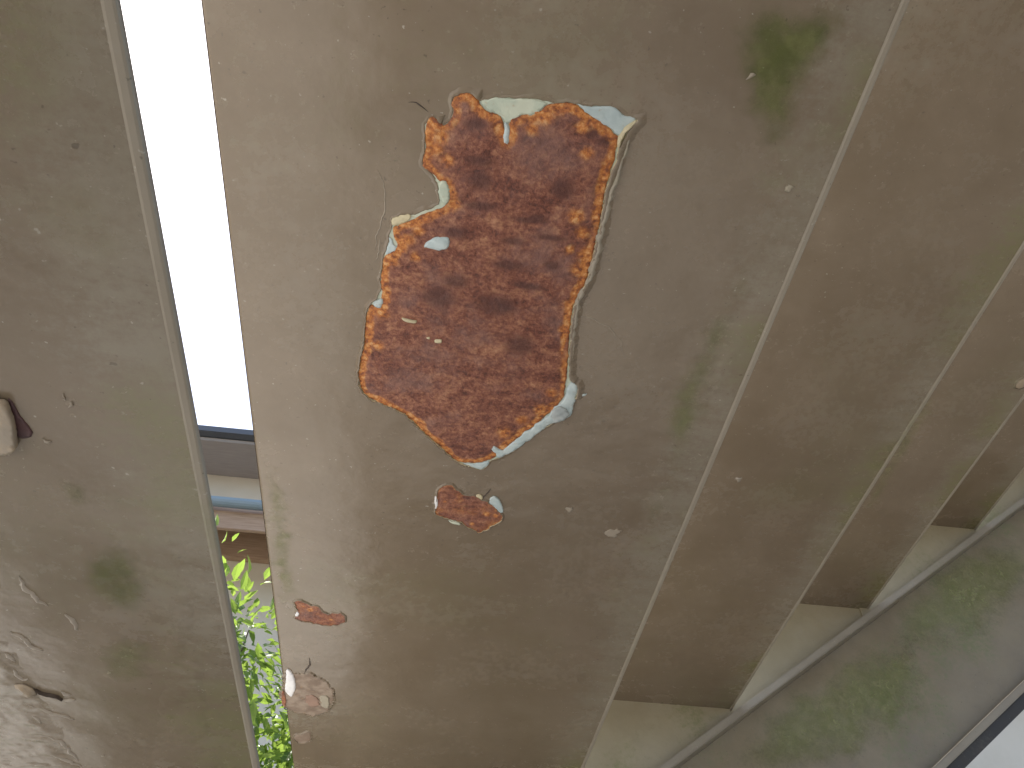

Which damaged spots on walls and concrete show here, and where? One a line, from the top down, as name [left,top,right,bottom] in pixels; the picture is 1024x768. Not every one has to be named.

rust [355,86,647,470]
peeling [0,398,33,456]
rust [432,483,505,534]
rust [293,599,347,627]
peeling [278,658,336,717]